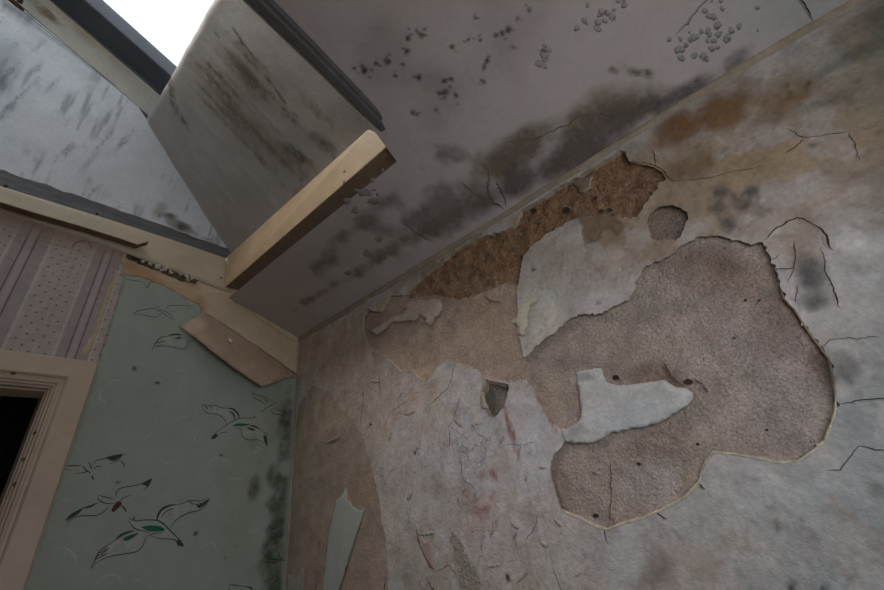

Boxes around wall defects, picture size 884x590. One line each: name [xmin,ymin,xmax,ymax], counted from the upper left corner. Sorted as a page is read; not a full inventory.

crack [675,0,707,36]
crack [798,0,813,21]
leakage [196,41,307,166]
leakage [483,78,704,195]
crack [632,128,860,183]
crack [764,217,840,308]
spalling [364,154,840,531]
leakage [265,470,287,590]
peeling [286,386,389,590]